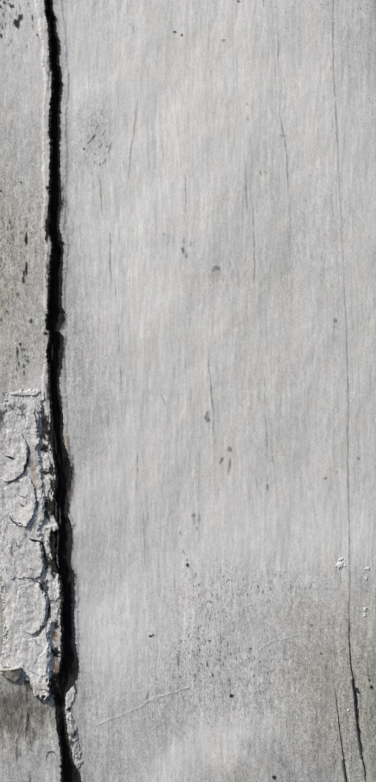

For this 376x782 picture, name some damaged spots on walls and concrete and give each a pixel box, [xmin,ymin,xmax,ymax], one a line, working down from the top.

peeling [0,389,61,701]
crack [40,0,81,782]
crack [336,624,366,782]